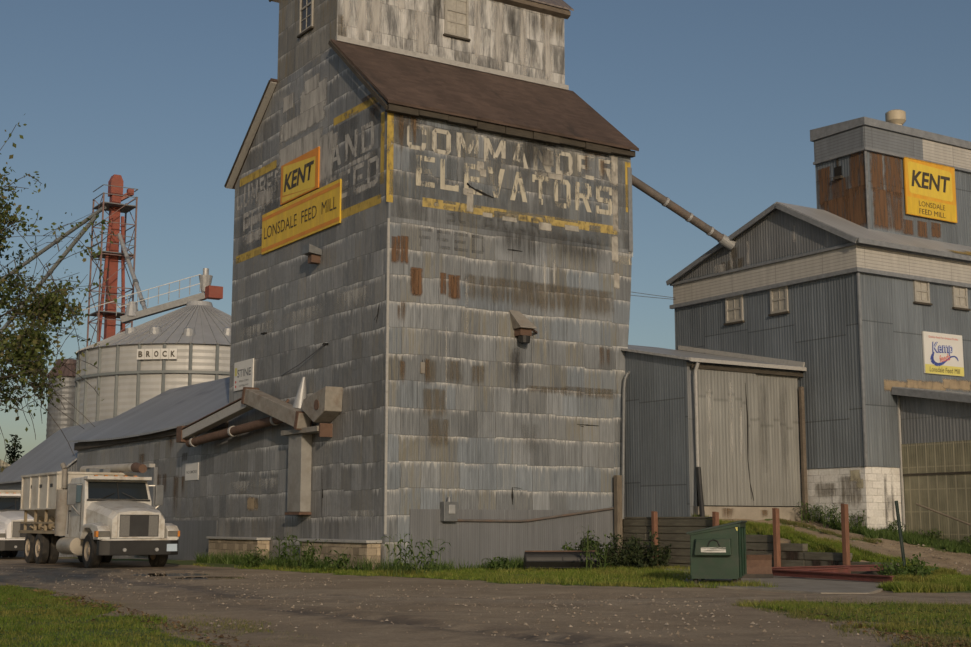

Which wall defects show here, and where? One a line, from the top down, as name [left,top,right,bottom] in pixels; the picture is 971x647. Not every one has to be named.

leakage [495,3,551,75]
corrosion [818,151,941,238]
corrosion [392,236,422,295]
corrosion [440,273,460,299]
leakage [466,264,606,310]
crack [745,384,754,501]